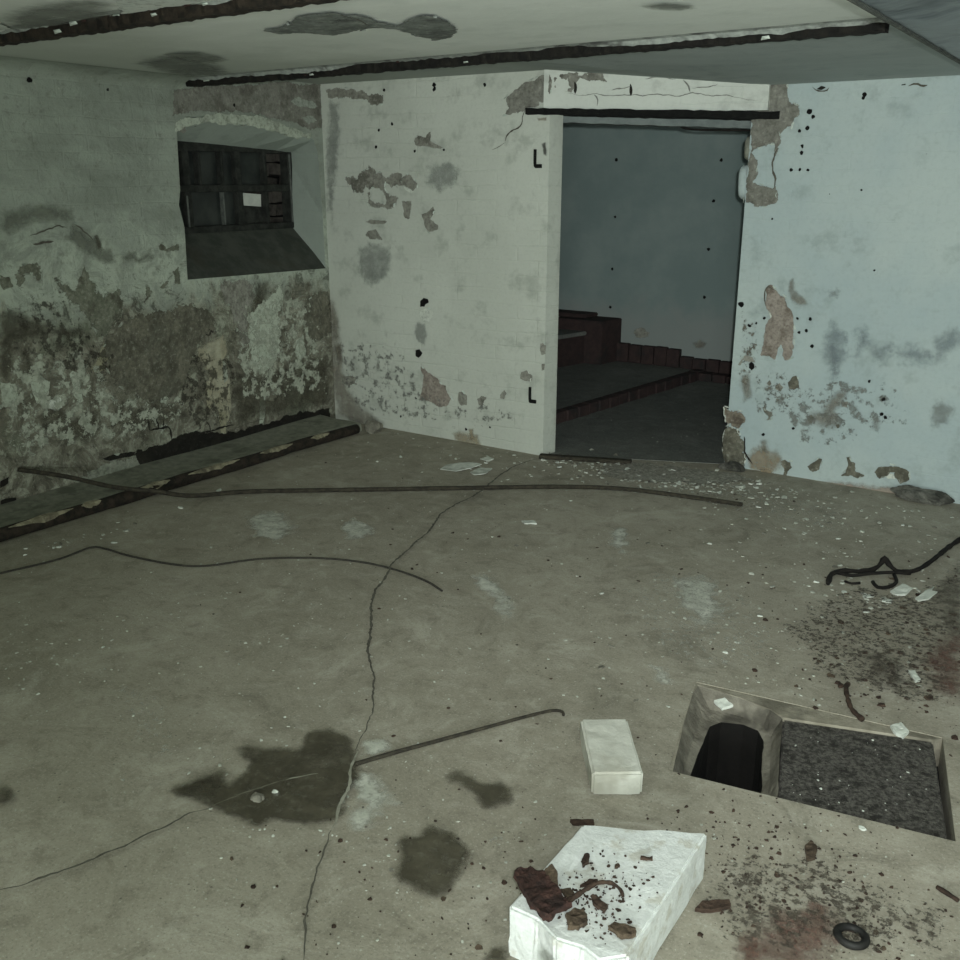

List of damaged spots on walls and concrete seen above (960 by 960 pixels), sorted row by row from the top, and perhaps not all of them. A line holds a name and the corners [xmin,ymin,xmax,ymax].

flaking render [503,72,607,117]
flaking render [743,84,815,208]
leakage [4,206,113,262]
flaking render [345,167,438,240]
flaking render [0,263,332,465]
leakage [198,284,466,434]
peeling [738,285,812,370]
flaking render [721,406,747,466]
crack [303,446,556,960]
leakage [173,730,387,829]
leakage [449,772,511,808]
leakage [397,828,467,895]